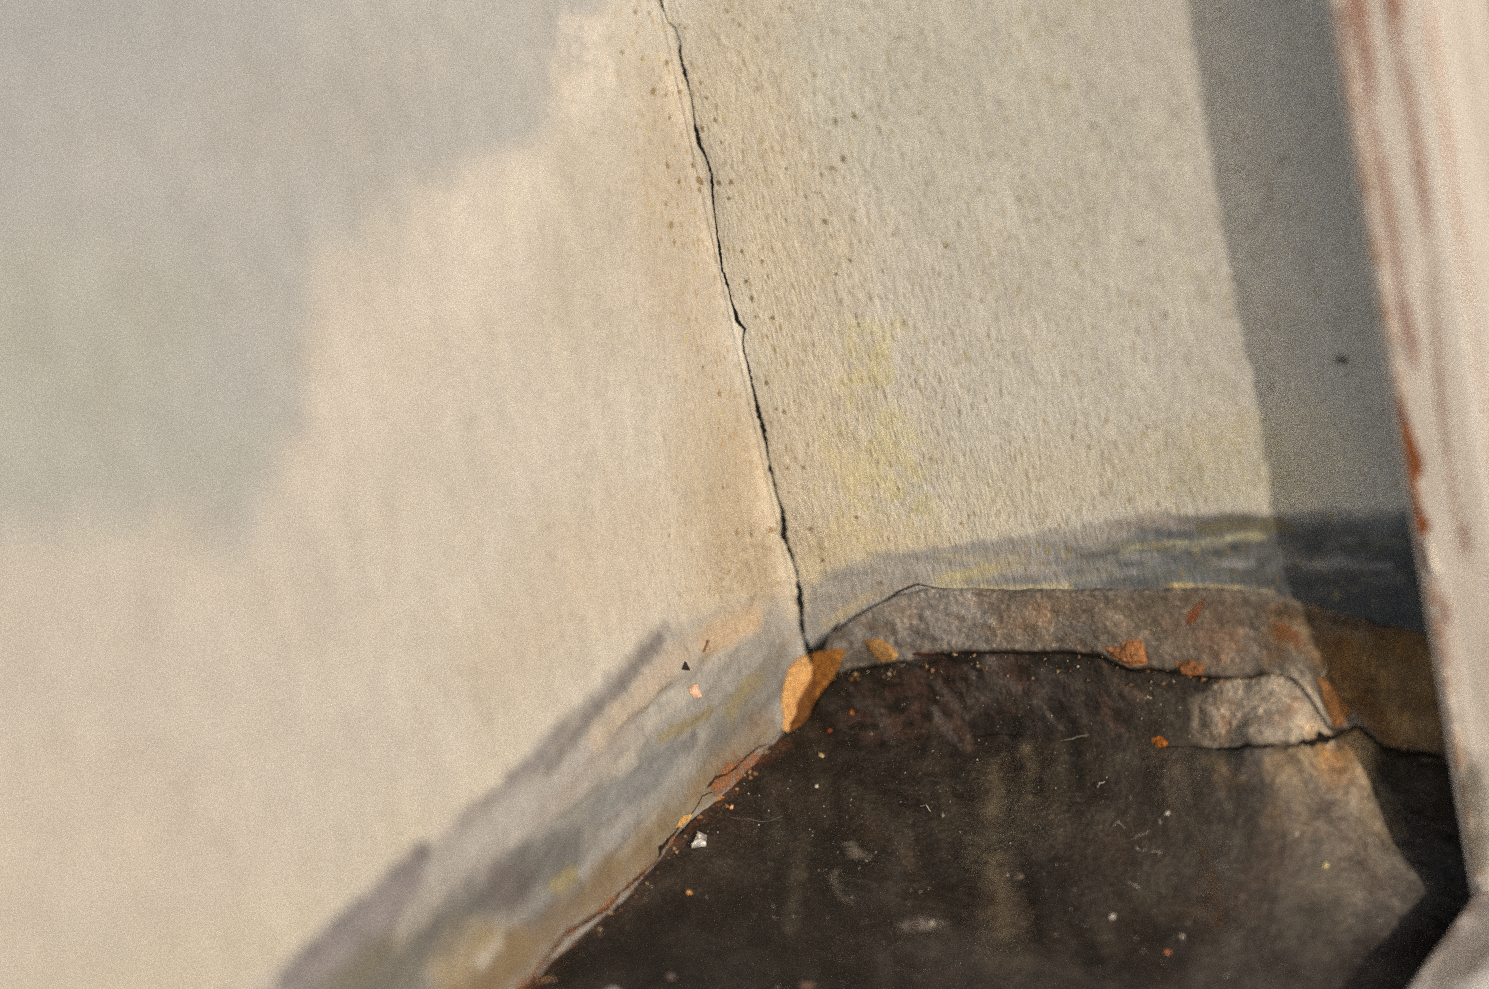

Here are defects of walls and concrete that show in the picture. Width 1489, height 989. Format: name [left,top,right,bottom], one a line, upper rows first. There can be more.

crack [660,0,945,654]
spalling [781,649,845,732]
spalling [863,638,899,663]
crack [1161,725,1444,760]